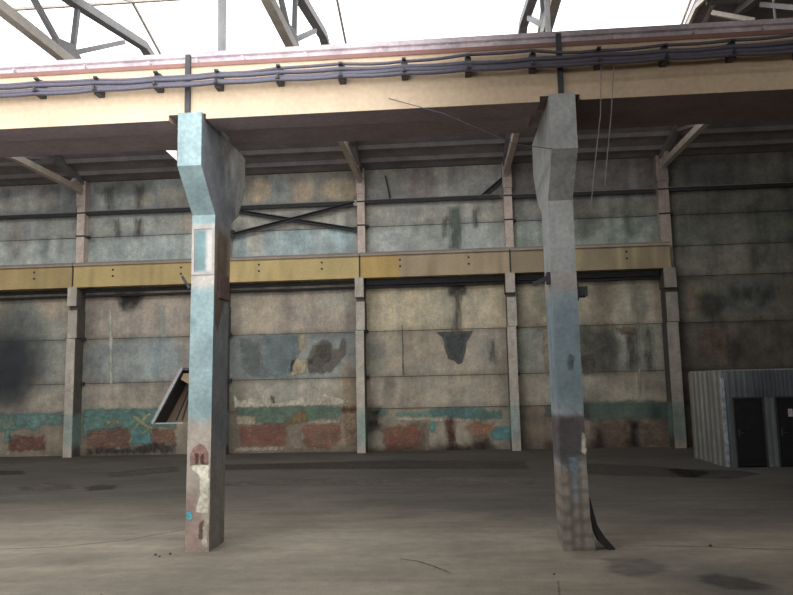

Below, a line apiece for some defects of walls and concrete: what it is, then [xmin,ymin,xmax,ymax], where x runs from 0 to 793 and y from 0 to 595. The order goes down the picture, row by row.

peeling [241,334,306,377]
damp [437,285,473,364]
peeling [83,408,176,446]
peeling [186,444,209,549]